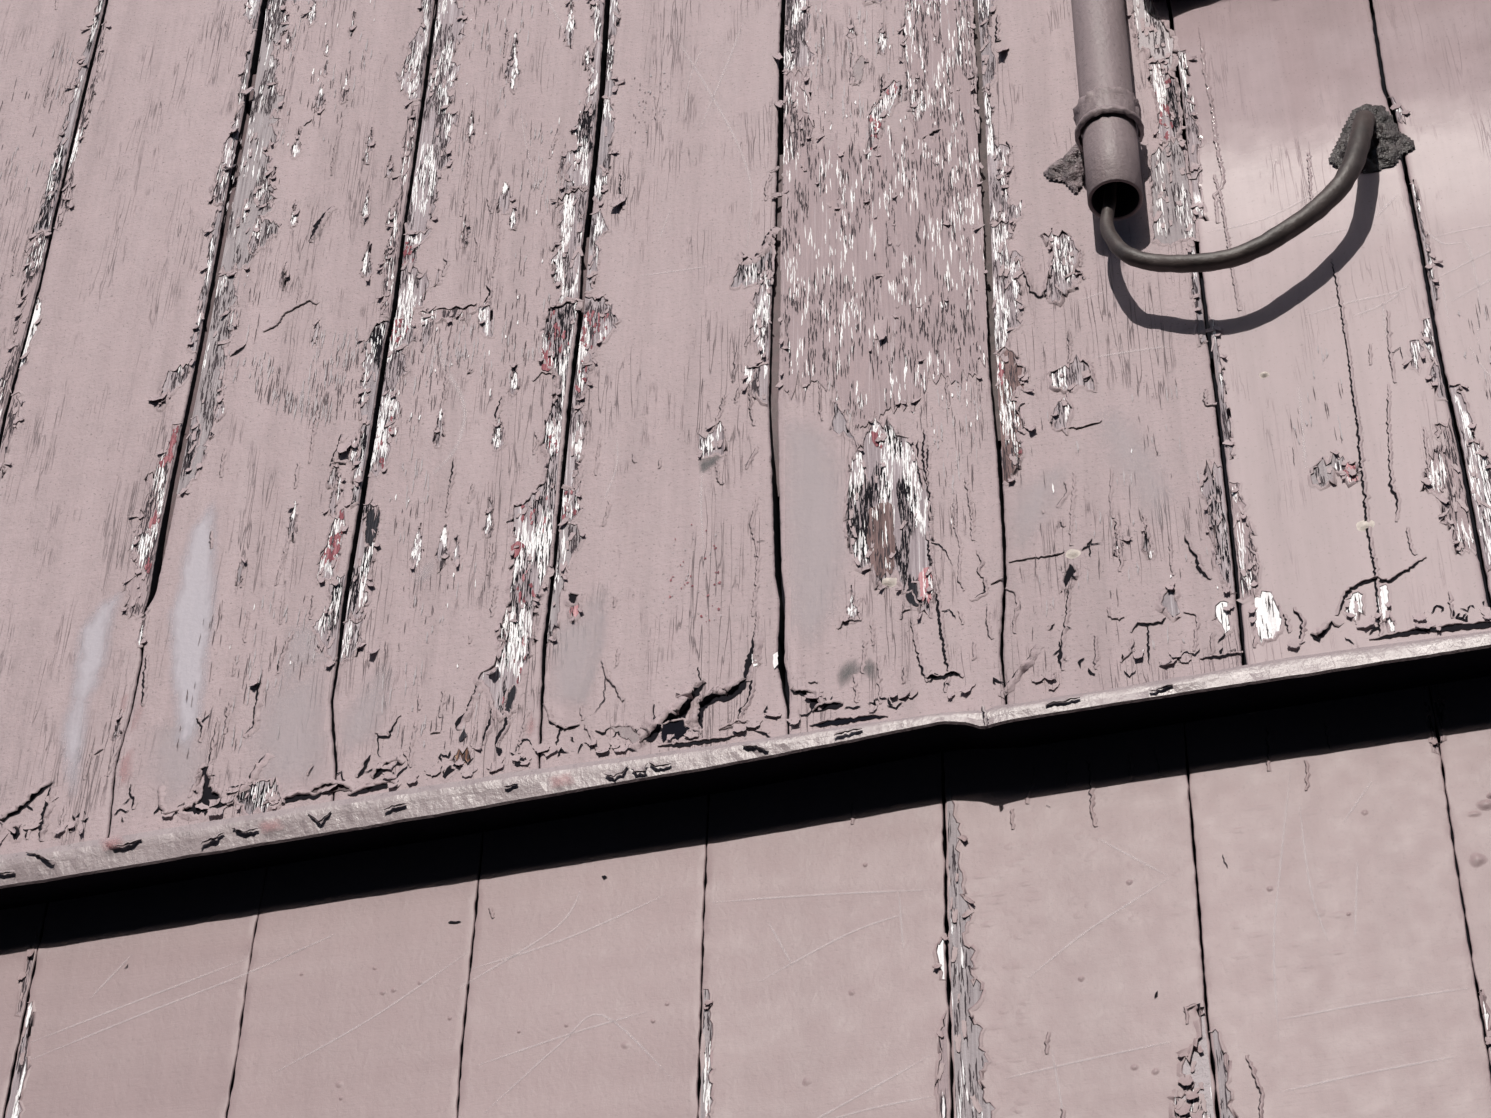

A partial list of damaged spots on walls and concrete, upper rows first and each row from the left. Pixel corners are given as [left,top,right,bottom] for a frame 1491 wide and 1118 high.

crack [0,44,74,303]
peeling [121,0,319,648]
peeling [310,0,495,667]
peeling [472,0,627,725]
crack [617,170,625,210]
crack [0,259,1491,874]
peeling [729,0,1097,624]
crack [1019,249,1086,298]
peeling [1126,0,1209,255]
crack [1189,27,1242,310]
crack [1306,153,1314,201]
peeling [1402,179,1491,572]